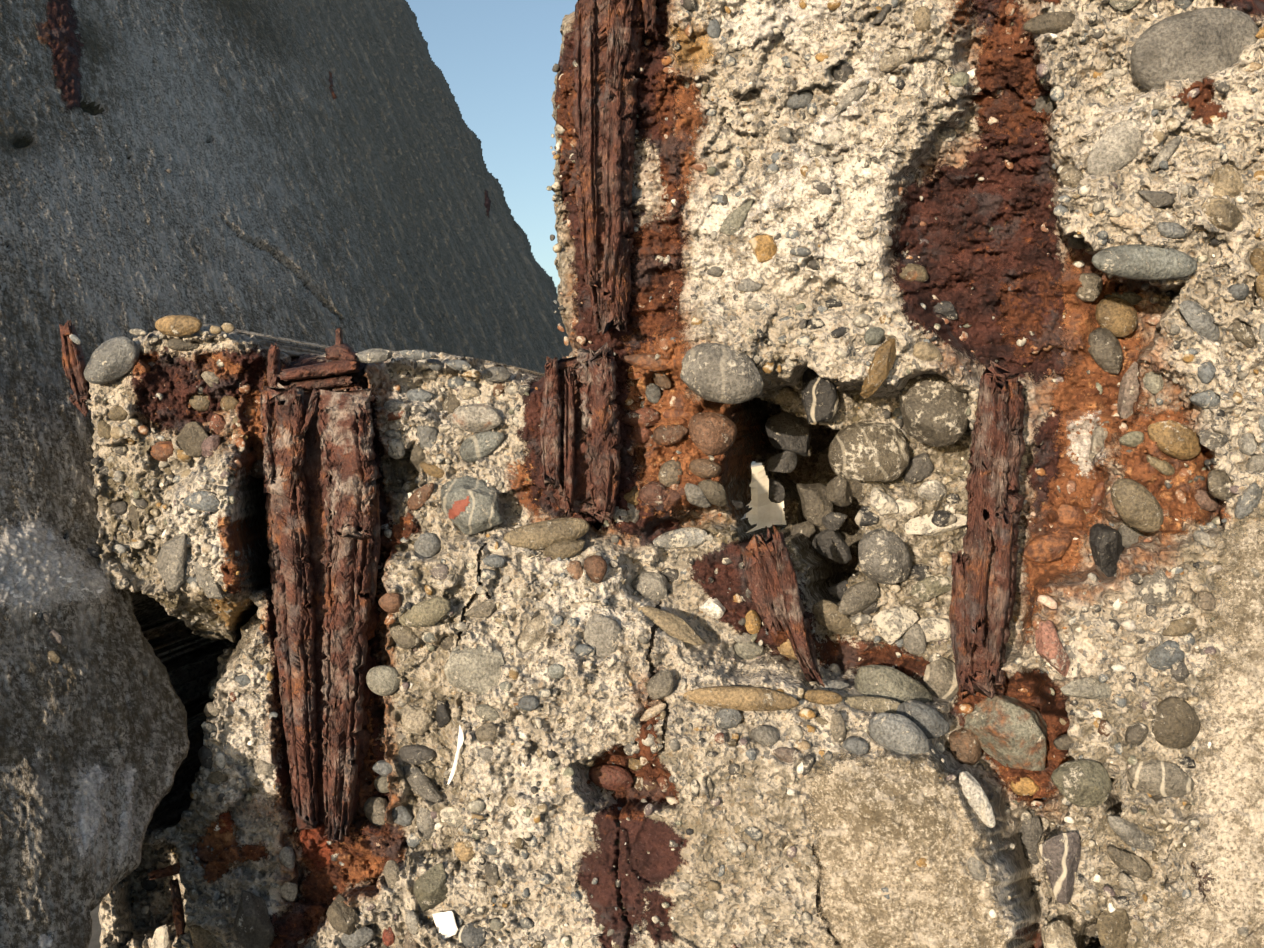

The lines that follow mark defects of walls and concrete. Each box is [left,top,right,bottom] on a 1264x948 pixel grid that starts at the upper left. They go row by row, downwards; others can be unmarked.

corrosion [507,0,768,547]
spalling [189,543,272,746]
spalling [233,475,267,513]
corrosion [128,344,421,948]
spalling [379,455,421,494]
crack [456,543,492,647]
crack [646,600,670,758]
spalling [726,397,864,601]
corrosion [690,0,1231,808]
corrosion [575,702,692,948]
crack [812,844,838,945]
crack [1191,861,1215,916]